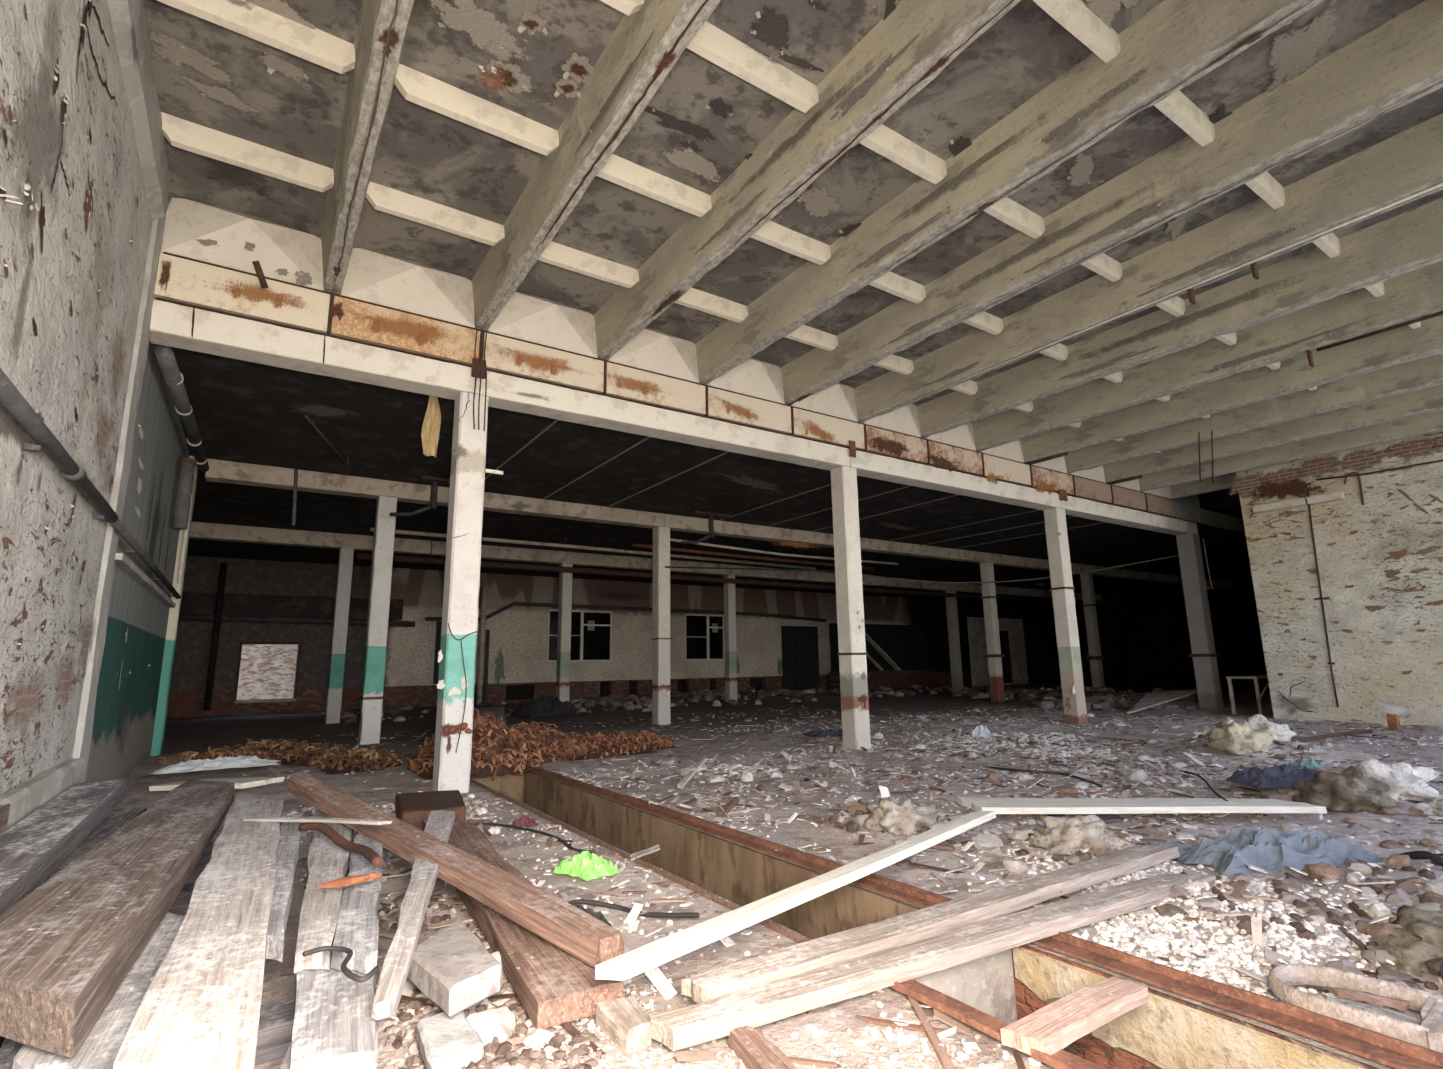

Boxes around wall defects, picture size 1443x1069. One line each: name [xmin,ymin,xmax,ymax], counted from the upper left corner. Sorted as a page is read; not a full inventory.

spalling [554,51,595,99]
spalling [52,58,70,128]
peeling [0,178,68,259]
rust [214,281,307,308]
rust [332,303,459,346]
rust [490,342,583,375]
rust [607,374,662,395]
rust [869,438,910,457]
rust [928,455,957,472]
flaking render [1230,436,1443,498]
peeling [1384,546,1443,578]
peeling [437,676,469,696]